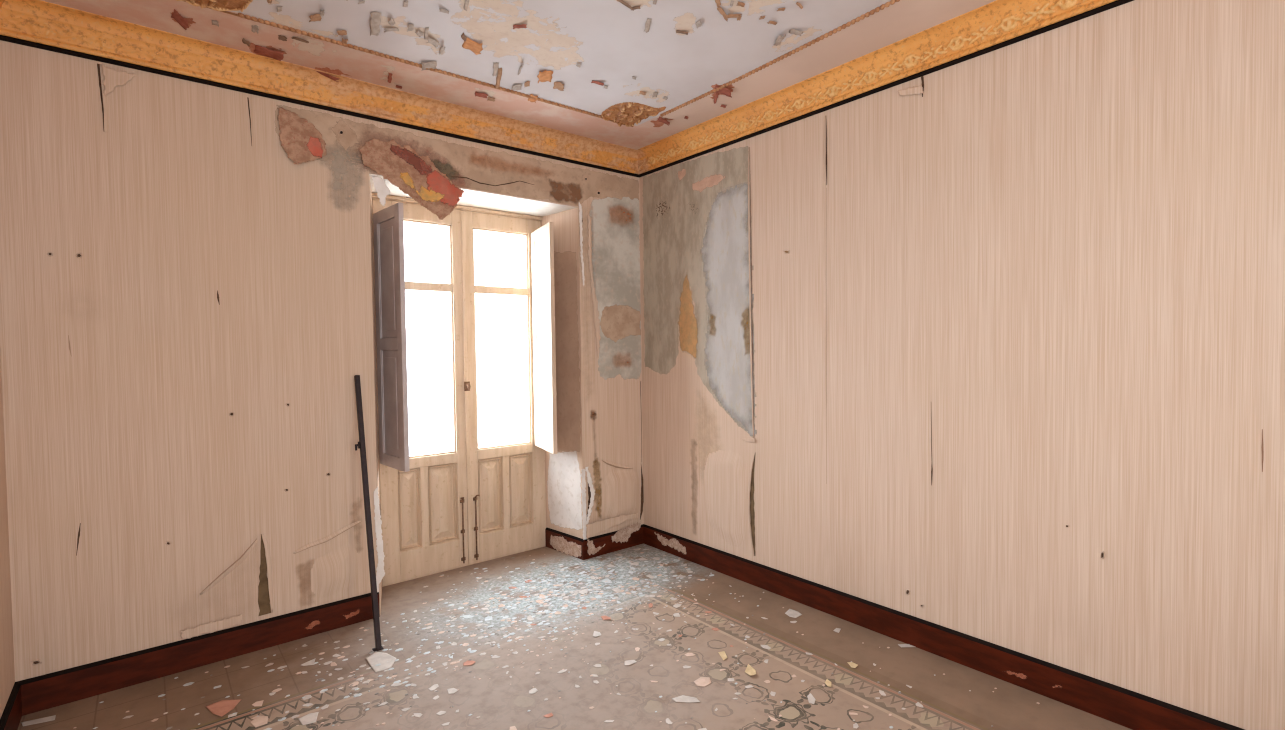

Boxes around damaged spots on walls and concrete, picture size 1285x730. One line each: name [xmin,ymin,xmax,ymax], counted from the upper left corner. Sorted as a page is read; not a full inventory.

peeling [171,9,196,30]
peeling [242,0,350,82]
peeling [346,0,445,71]
peeling [439,0,584,103]
peeling [616,0,657,33]
peeling [673,12,702,35]
peeling [715,0,822,52]
peeling [591,76,688,127]
peeling [710,84,734,108]
flaking render [275,105,755,438]
damp [741,310,750,347]
peeling [550,522,686,557]